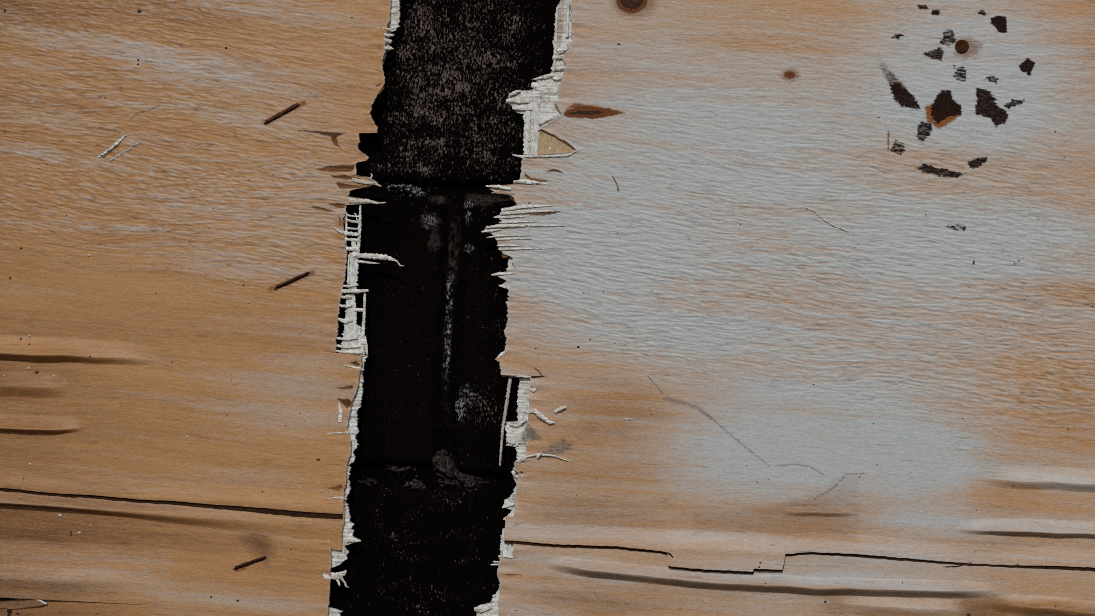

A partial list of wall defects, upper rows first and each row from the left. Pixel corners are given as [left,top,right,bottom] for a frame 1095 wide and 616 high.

spalling [537,127,576,155]
spalling [317,165,368,189]
peeling [386,183,428,198]
spalling [312,203,347,224]
peeling [386,449,490,492]
crack [0,467,344,550]
crack [504,516,1095,574]